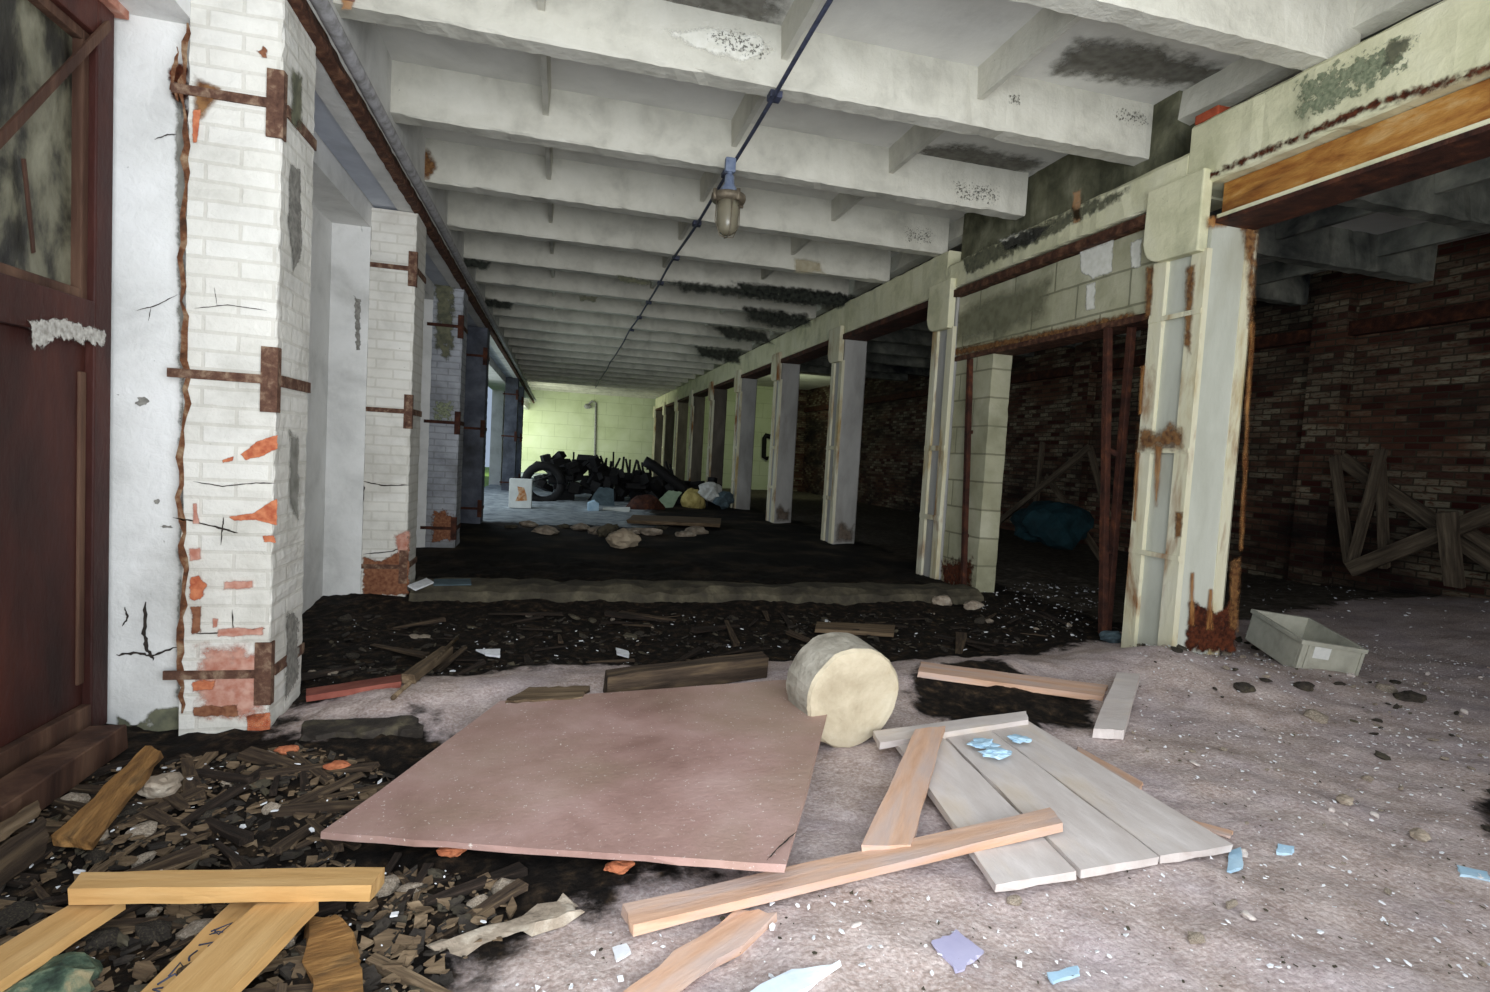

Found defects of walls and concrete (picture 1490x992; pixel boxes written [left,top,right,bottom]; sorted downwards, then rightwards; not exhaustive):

damp [665,0,781,23]
damp [1054,40,1222,85]
damp [1383,38,1411,66]
rust [168,64,220,143]
rust [1210,64,1490,178]
peeling [288,164,302,269]
rust [1184,216,1258,653]
flaking render [222,430,299,543]
crack [116,602,265,660]
flaking render [189,548,263,637]
flaking render [362,531,410,596]
flaking render [117,680,271,732]